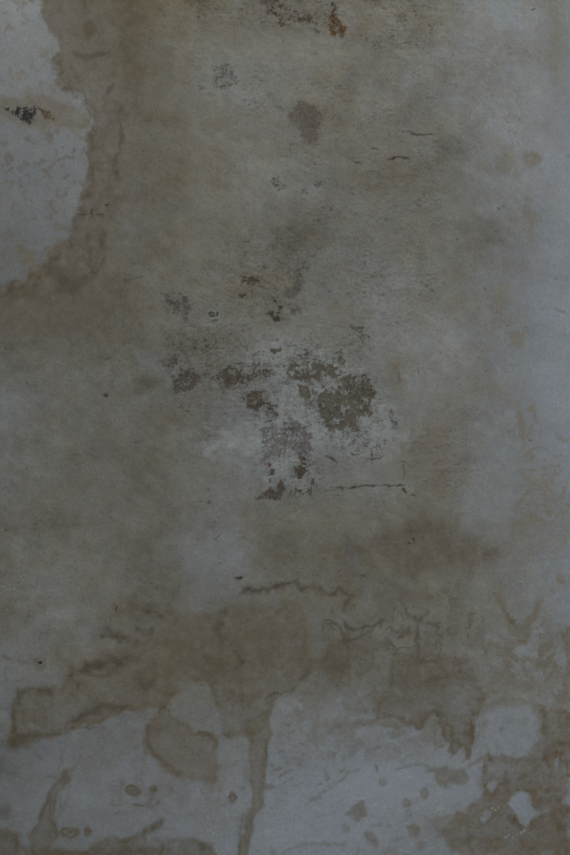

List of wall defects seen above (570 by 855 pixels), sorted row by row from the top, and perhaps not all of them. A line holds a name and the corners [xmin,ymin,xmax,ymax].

water stain [270,0,374,67]
rust [327,0,349,39]
water stain [0,0,166,350]
spalling [238,261,266,299]
spalling [265,256,309,324]
spalling [162,338,403,504]
water stain [0,320,570,855]